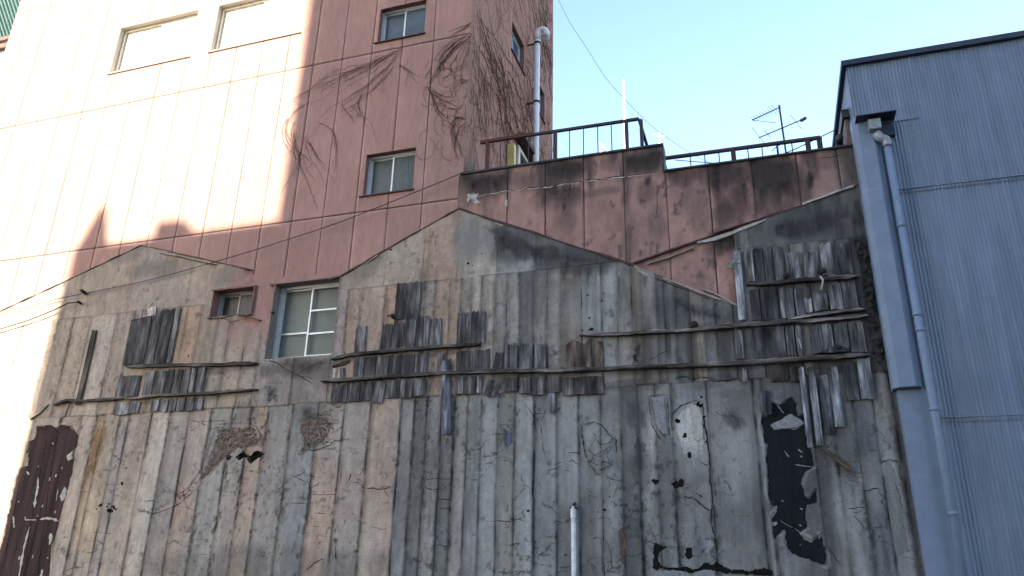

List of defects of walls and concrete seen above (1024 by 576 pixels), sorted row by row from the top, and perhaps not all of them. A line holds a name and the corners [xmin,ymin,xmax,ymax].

crack [467,173,658,220]
damp [713,235,734,247]
spalling [194,424,262,484]
spalling [298,412,342,455]
peeling [0,425,79,576]
peeling [761,398,826,564]
peeling [654,562,773,576]